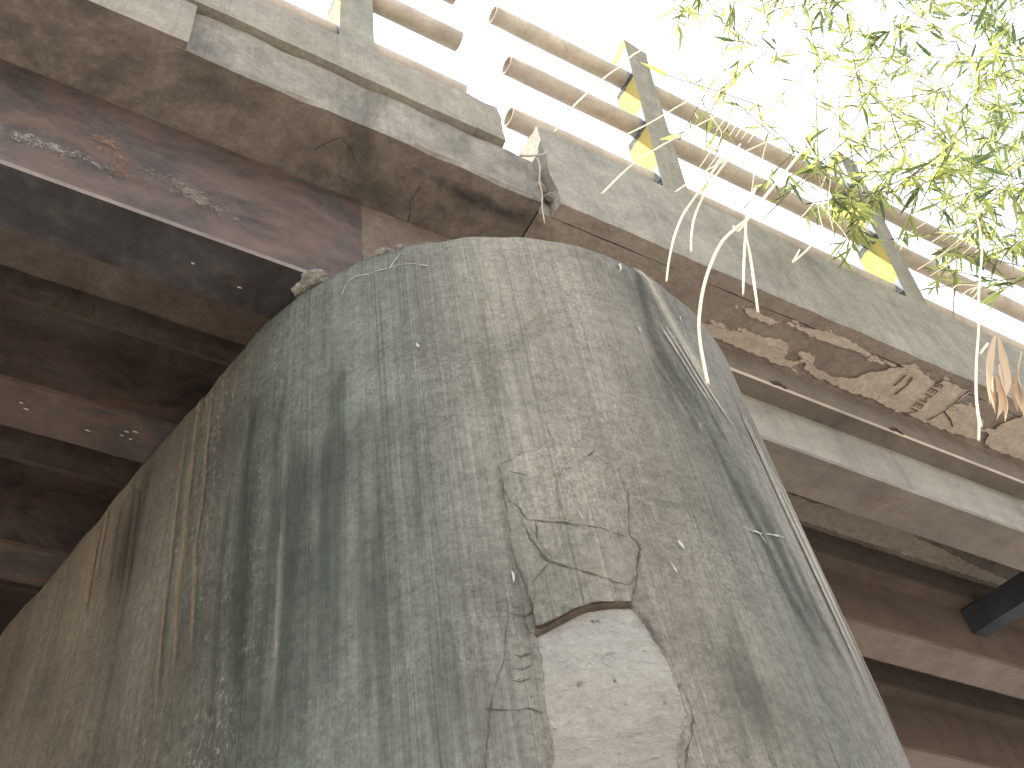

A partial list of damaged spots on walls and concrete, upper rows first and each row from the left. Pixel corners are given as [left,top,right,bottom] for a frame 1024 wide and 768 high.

peeling [701,305,1024,461]
crack [483,429,667,768]
spalling [535,602,685,768]
crack [678,683,694,768]